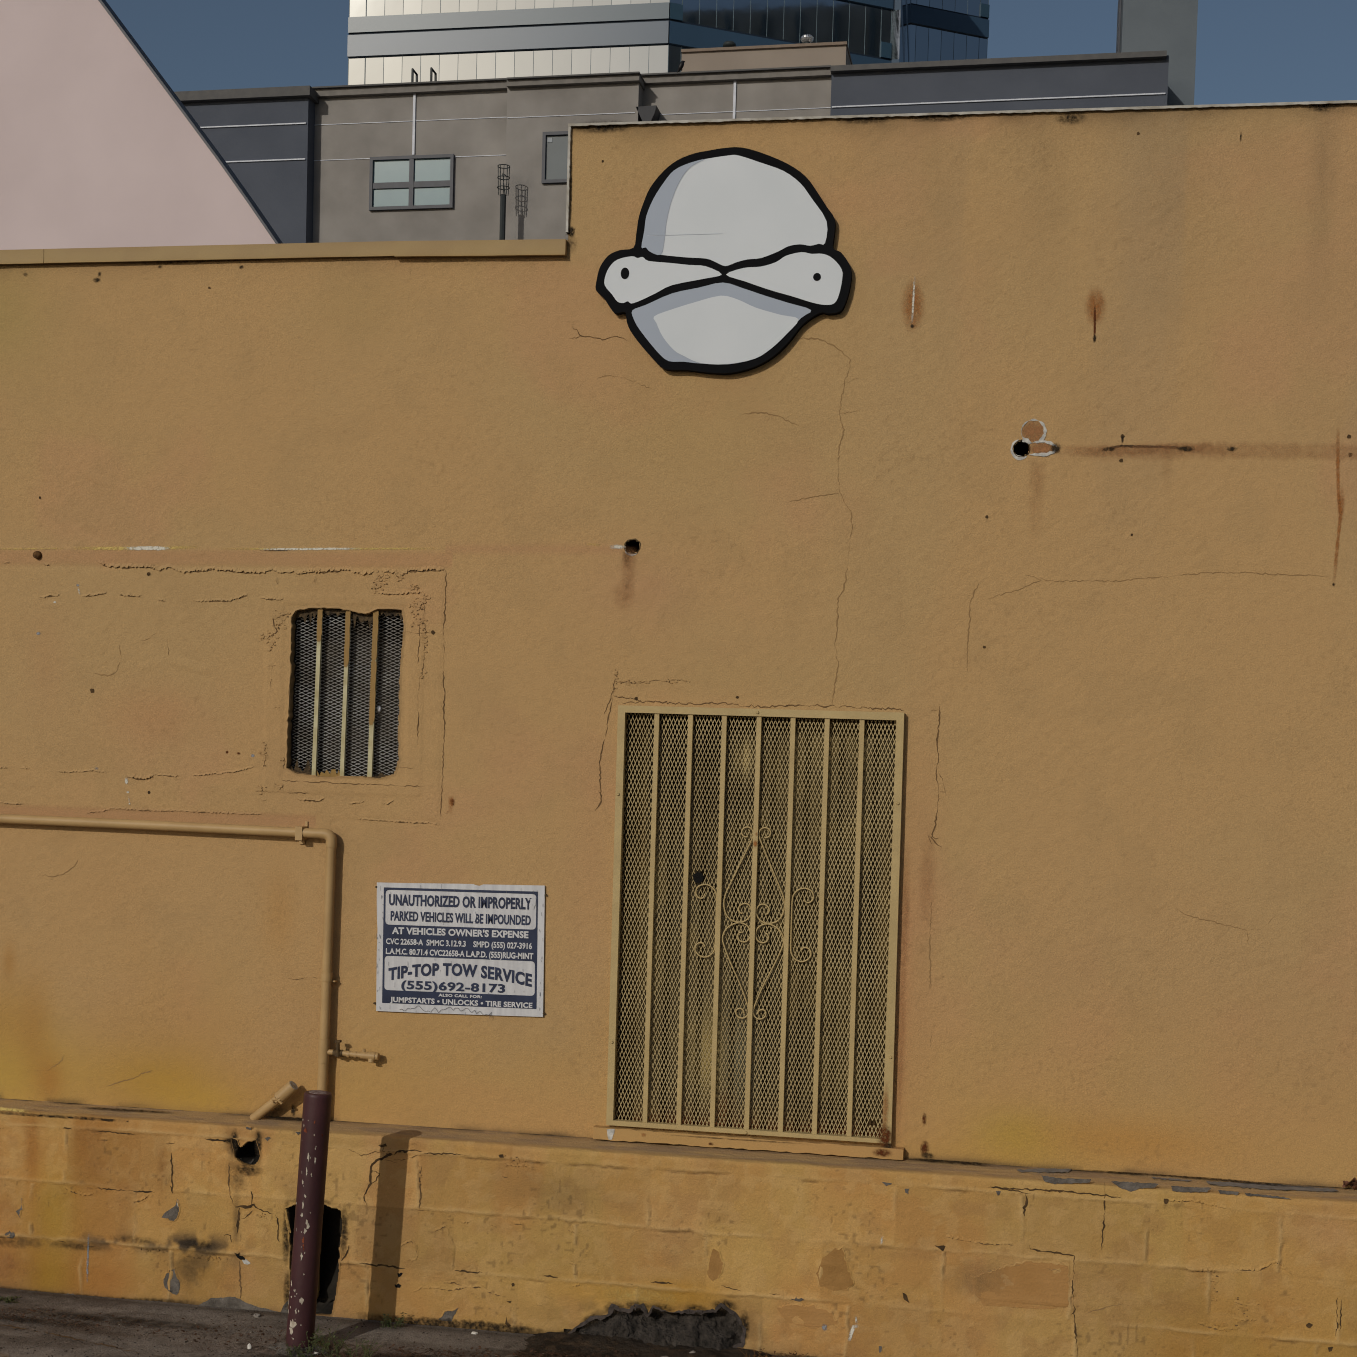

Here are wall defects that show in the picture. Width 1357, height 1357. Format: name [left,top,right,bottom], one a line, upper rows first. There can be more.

corrosion [906,283,919,328]
corrosion [1090,296,1102,342]
corrosion [1335,450,1343,561]
peeling [98,559,444,679]
crack [596,337,903,809]
crack [967,572,1328,675]
crack [928,706,945,847]
spalling [199,1120,344,1339]
crack [349,1147,472,1211]
peeling [816,1247,855,1291]
peeling [1111,1177,1338,1204]
spalling [565,1303,746,1351]